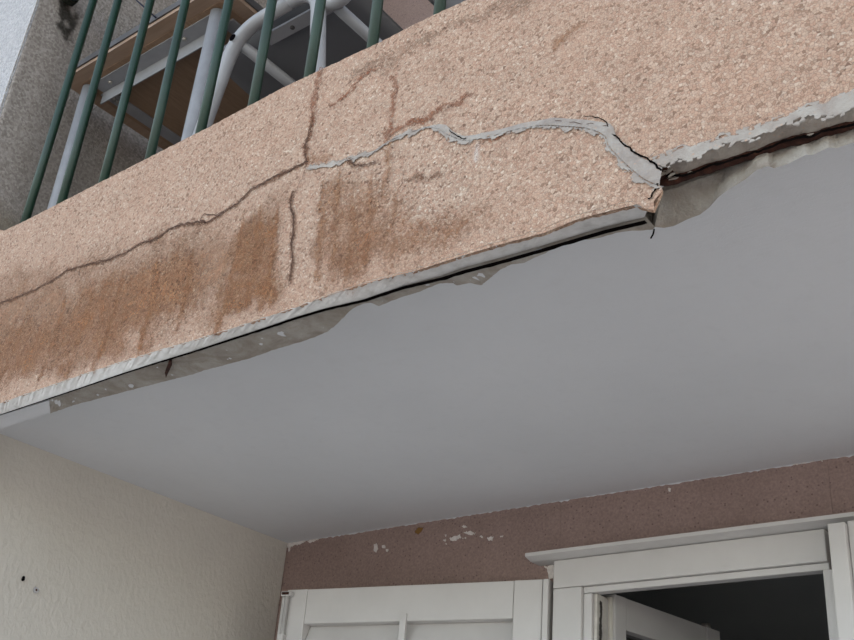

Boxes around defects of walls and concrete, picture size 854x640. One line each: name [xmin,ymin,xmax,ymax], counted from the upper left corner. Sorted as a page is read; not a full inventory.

water stain [0,221,261,361]
crack [0,67,323,305]
crack [0,220,647,415]
crack [345,158,378,167]
spalling [49,89,854,413]
crack [555,116,854,199]
peeling [443,525,503,545]